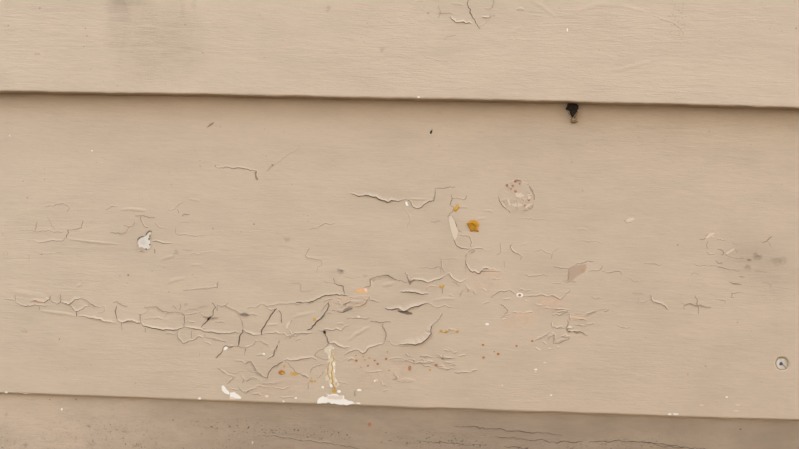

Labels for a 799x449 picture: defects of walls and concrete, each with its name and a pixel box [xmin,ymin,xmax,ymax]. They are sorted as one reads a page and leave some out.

crack [216,165,259,180]
crack [15,187,622,398]
crack [633,293,711,314]
peeling [317,347,360,406]